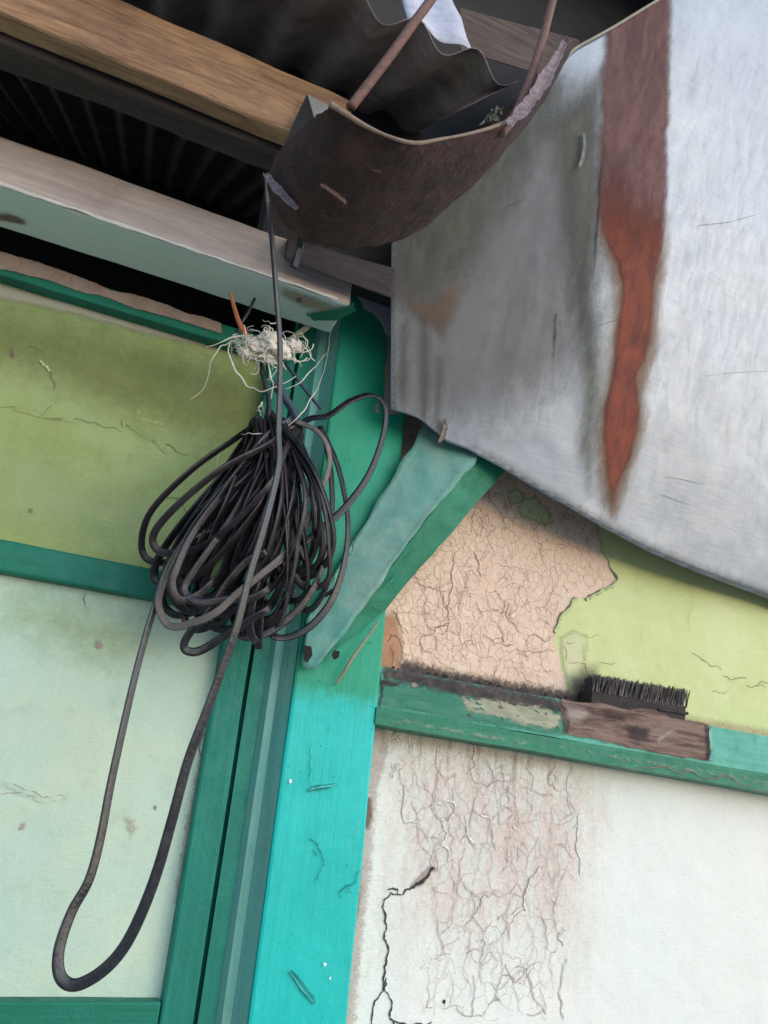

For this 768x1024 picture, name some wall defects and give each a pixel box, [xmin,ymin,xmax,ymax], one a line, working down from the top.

corrosion [320,183,346,205]
corrosion [599,0,671,508]
crack [0,346,121,432]
peeling [357,296,424,461]
crack [379,471,617,707]
peeling [379,471,768,792]
crack [371,731,583,1024]